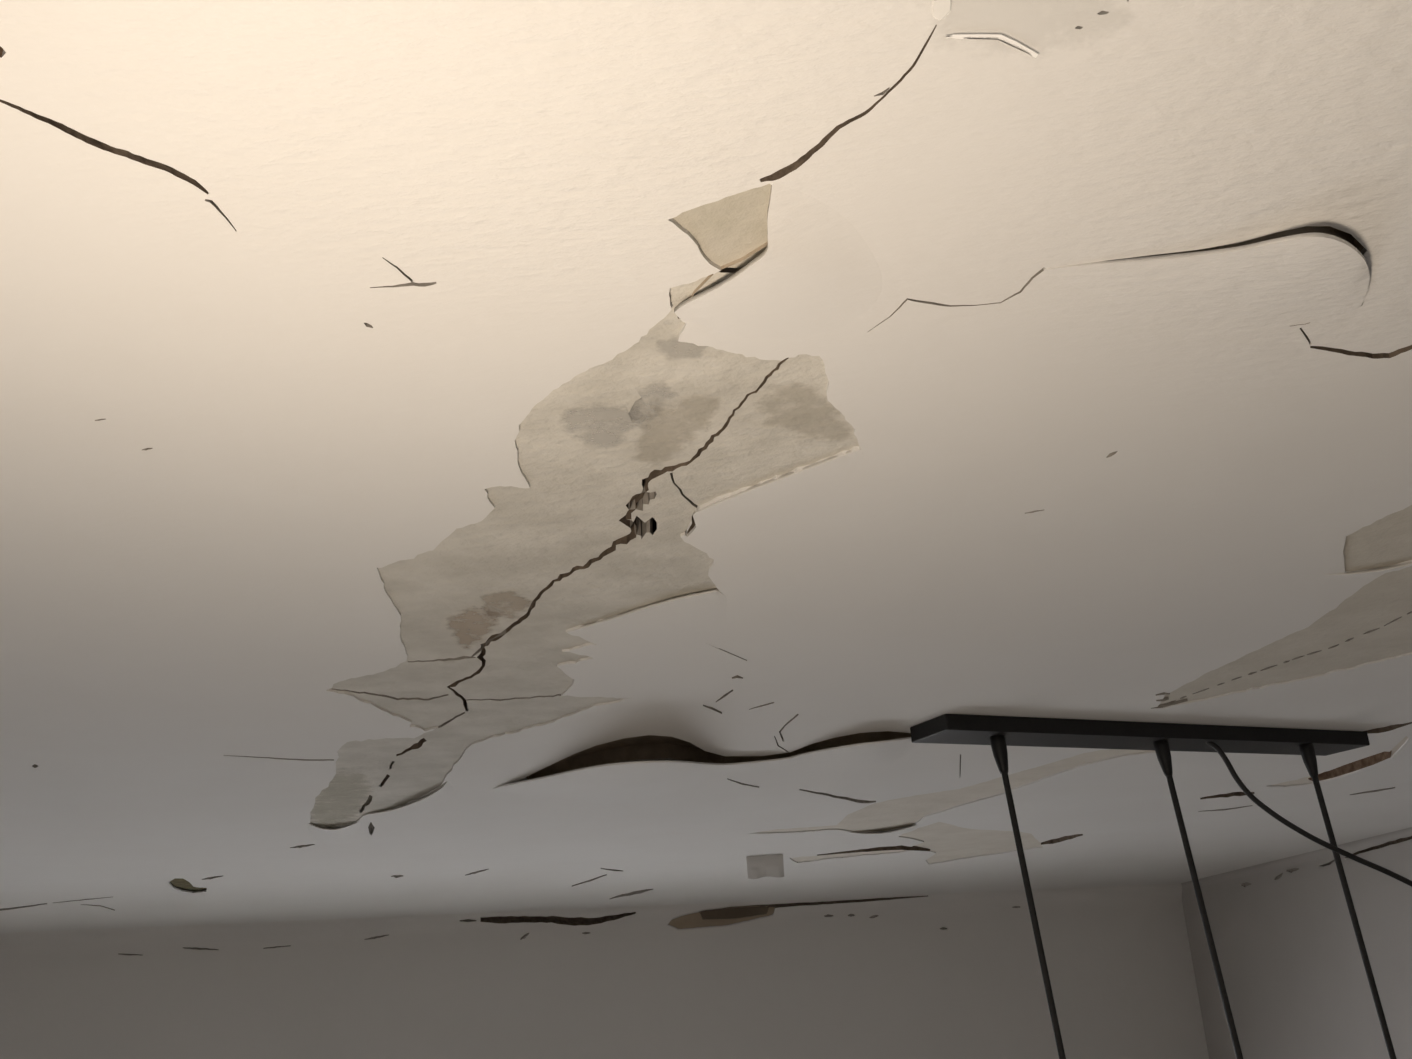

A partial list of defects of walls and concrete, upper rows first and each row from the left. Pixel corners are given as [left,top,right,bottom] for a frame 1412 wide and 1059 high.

crack [0,99,236,231]
crack [760,25,937,182]
crack [370,258,436,288]
crack [1293,323,1412,359]
peeling [290,184,864,848]
crack [332,358,799,813]
peeling [1159,505,1412,705]
crack [460,868,653,926]
peeling [746,855,784,879]
peeling [762,749,1155,864]